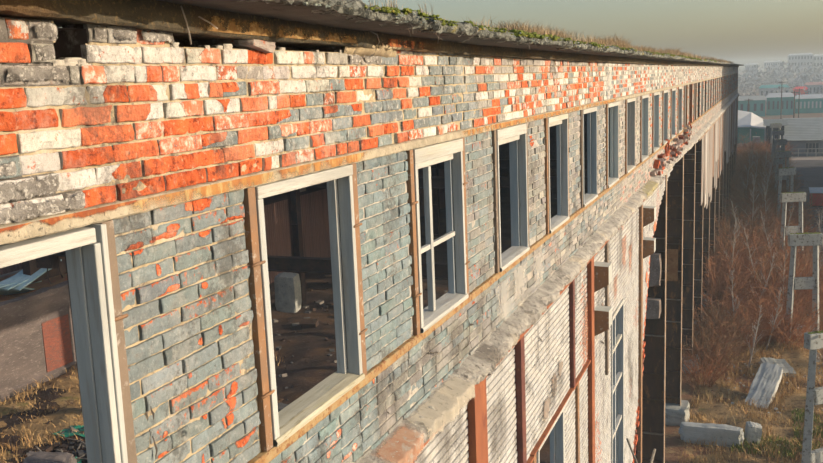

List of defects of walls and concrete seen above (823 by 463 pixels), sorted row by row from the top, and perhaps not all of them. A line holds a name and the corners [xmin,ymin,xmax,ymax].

flaking render [0,22,440,224]
spalling [650,121,692,184]
corrosion [0,152,364,233]
flaking render [125,223,180,256]
flaking render [222,381,238,428]
flaking render [236,427,256,448]
spalling [378,377,475,463]